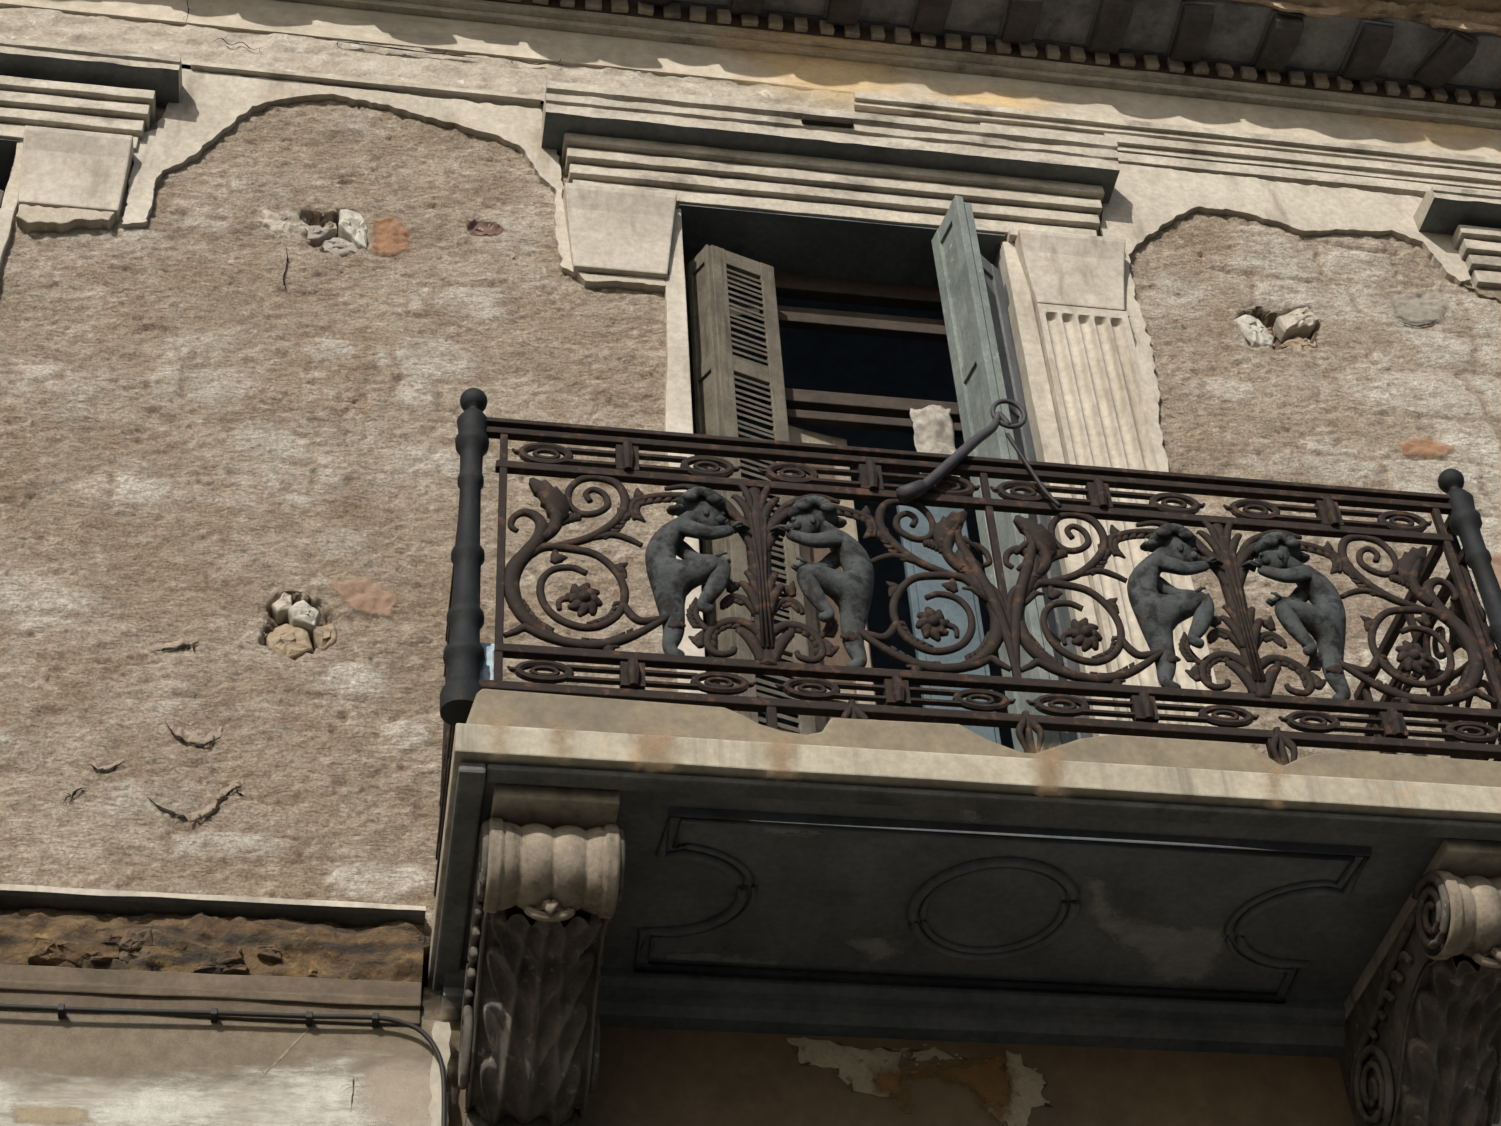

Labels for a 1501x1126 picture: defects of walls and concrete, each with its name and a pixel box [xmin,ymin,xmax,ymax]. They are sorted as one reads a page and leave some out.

spalling [262,209,409,258]
spalling [464,219,515,259]
flaking render [576,271,667,294]
spalling [1234,306,1319,351]
flaking render [1491,552,1501,588]
spalling [263,591,338,660]
crack [166,717,222,747]
crack [63,758,125,805]
crack [148,778,244,821]
spalling [27,928,156,968]
spalling [193,944,291,975]
peeling [787,1037,970,1099]